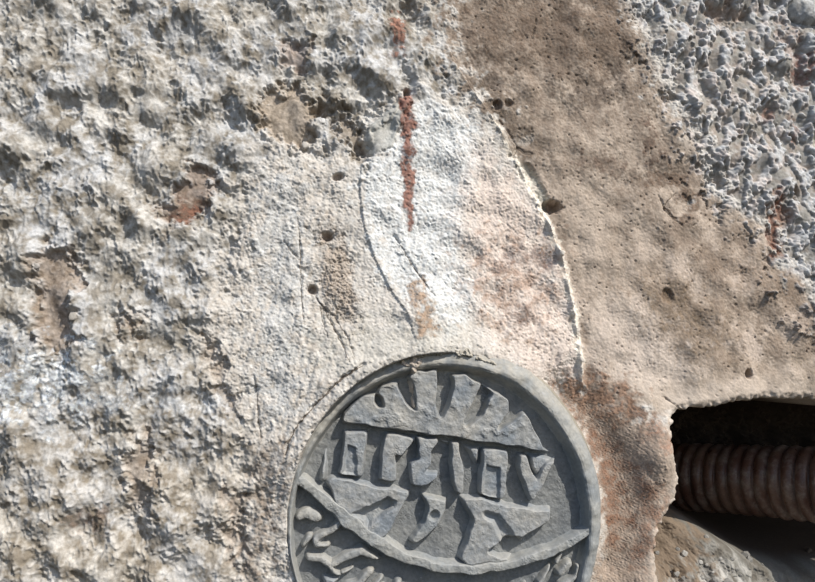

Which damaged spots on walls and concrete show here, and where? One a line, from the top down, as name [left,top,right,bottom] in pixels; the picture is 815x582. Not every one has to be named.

corrosion [390,10,406,57]
corrosion [399,96,418,231]
spalling [670,400,815,448]
spalling [653,504,815,582]